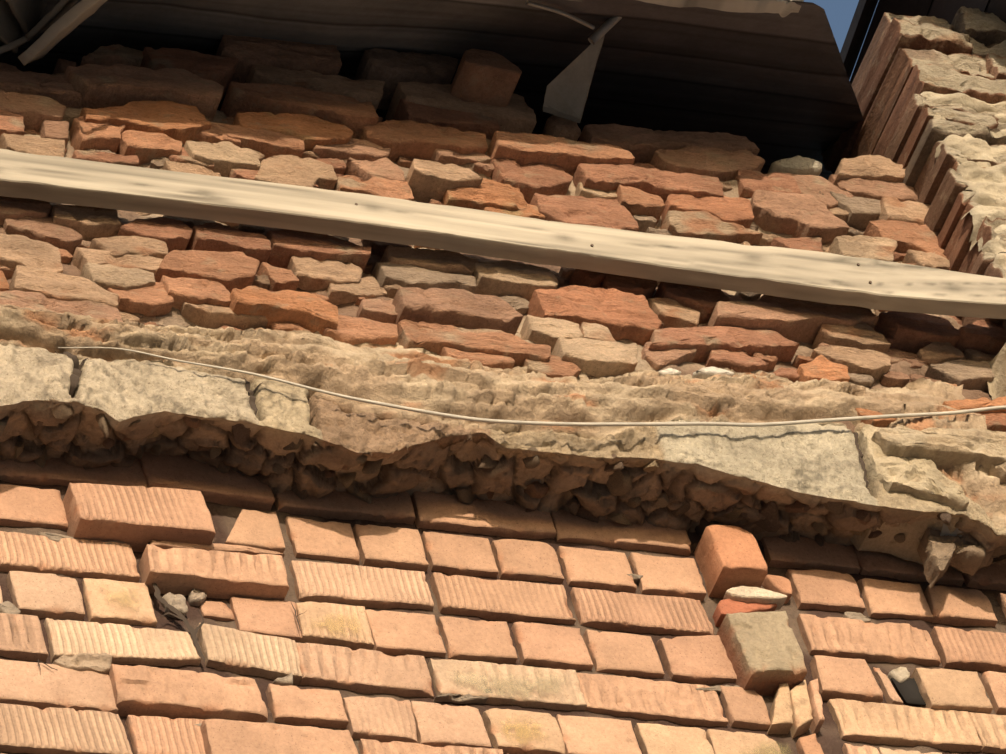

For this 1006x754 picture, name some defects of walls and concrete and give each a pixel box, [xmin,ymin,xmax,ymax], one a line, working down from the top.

spalling [0,399,1006,588]
spalling [161,589,207,619]
spalling [712,575,792,627]
spalling [52,653,112,674]
spalling [887,666,926,706]